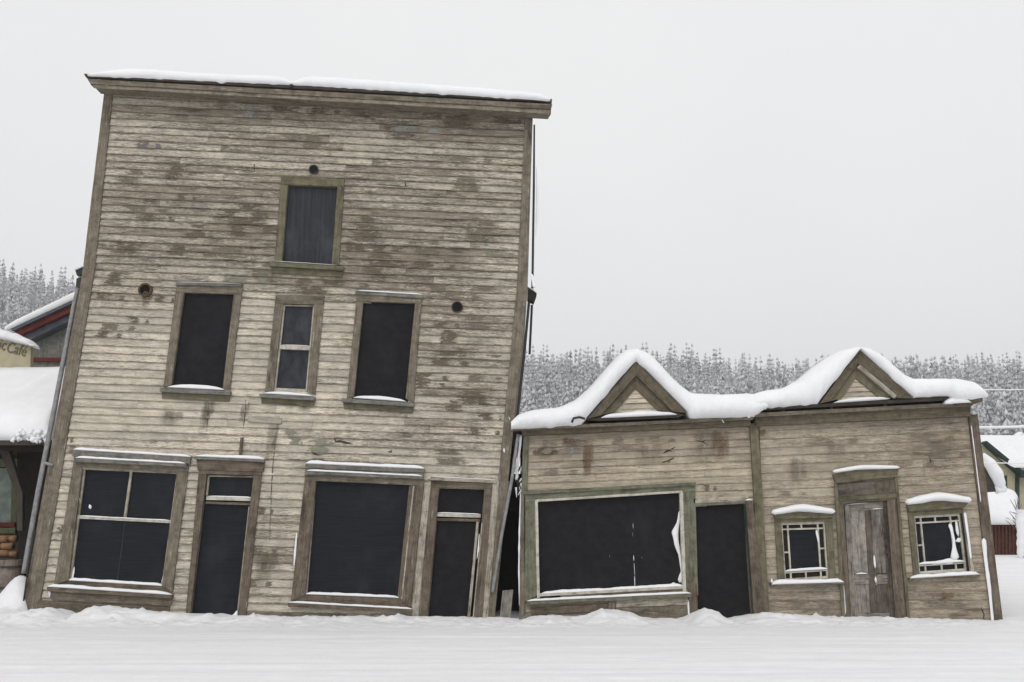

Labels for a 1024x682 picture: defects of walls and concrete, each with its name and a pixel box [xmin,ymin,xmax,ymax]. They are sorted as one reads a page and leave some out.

peeling [123,194,197,221]
peeling [166,224,208,256]
peeling [203,204,277,277]
peeling [95,317,149,338]
peeling [285,430,336,453]